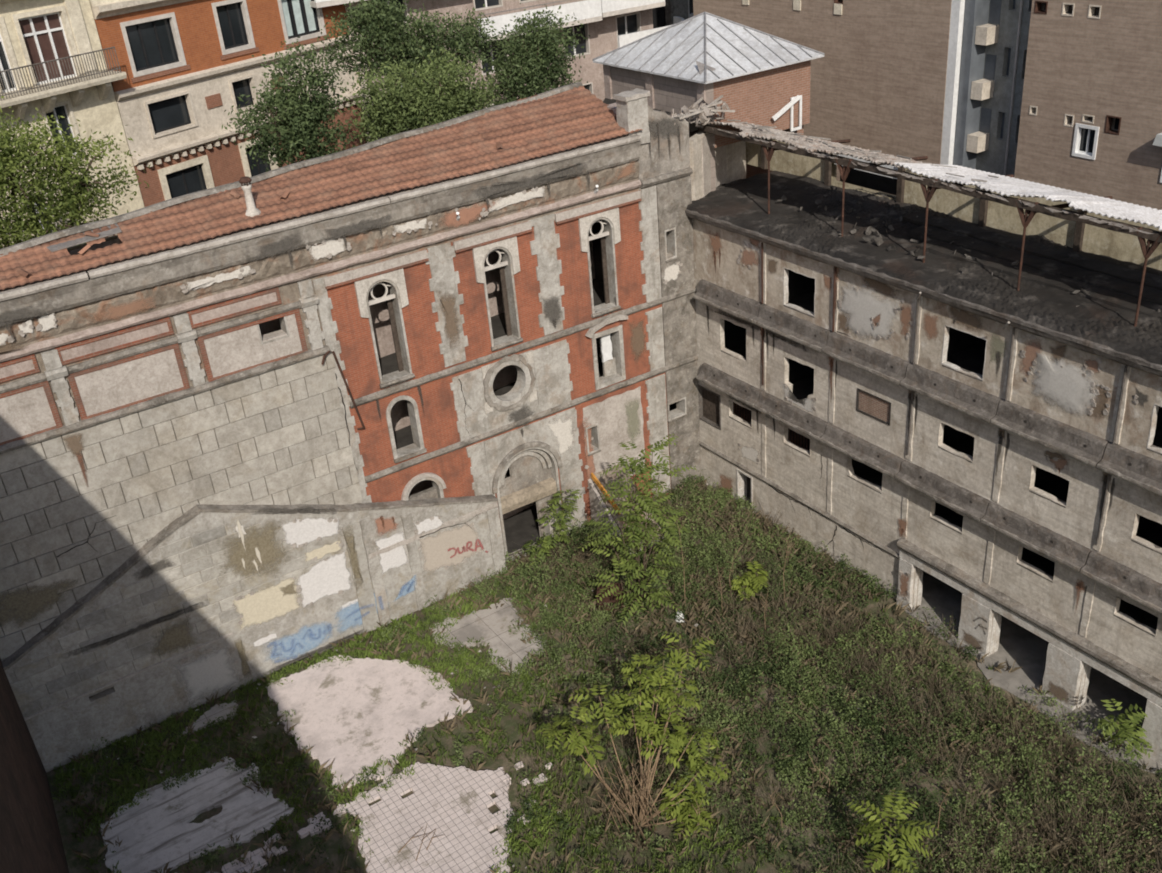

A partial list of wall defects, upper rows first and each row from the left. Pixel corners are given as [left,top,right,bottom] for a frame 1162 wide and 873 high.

spalling [392,186,548,236]
peeling [306,238,352,260]
peeling [180,266,256,294]
peeling [0,313,57,346]
peeling [1083,358,1111,417]
water stain [996,428,1010,473]
water stain [1100,471,1115,519]
crack [57,515,116,558]
water stain [236,520,262,571]
peeling [282,518,344,561]
peeling [232,577,313,630]